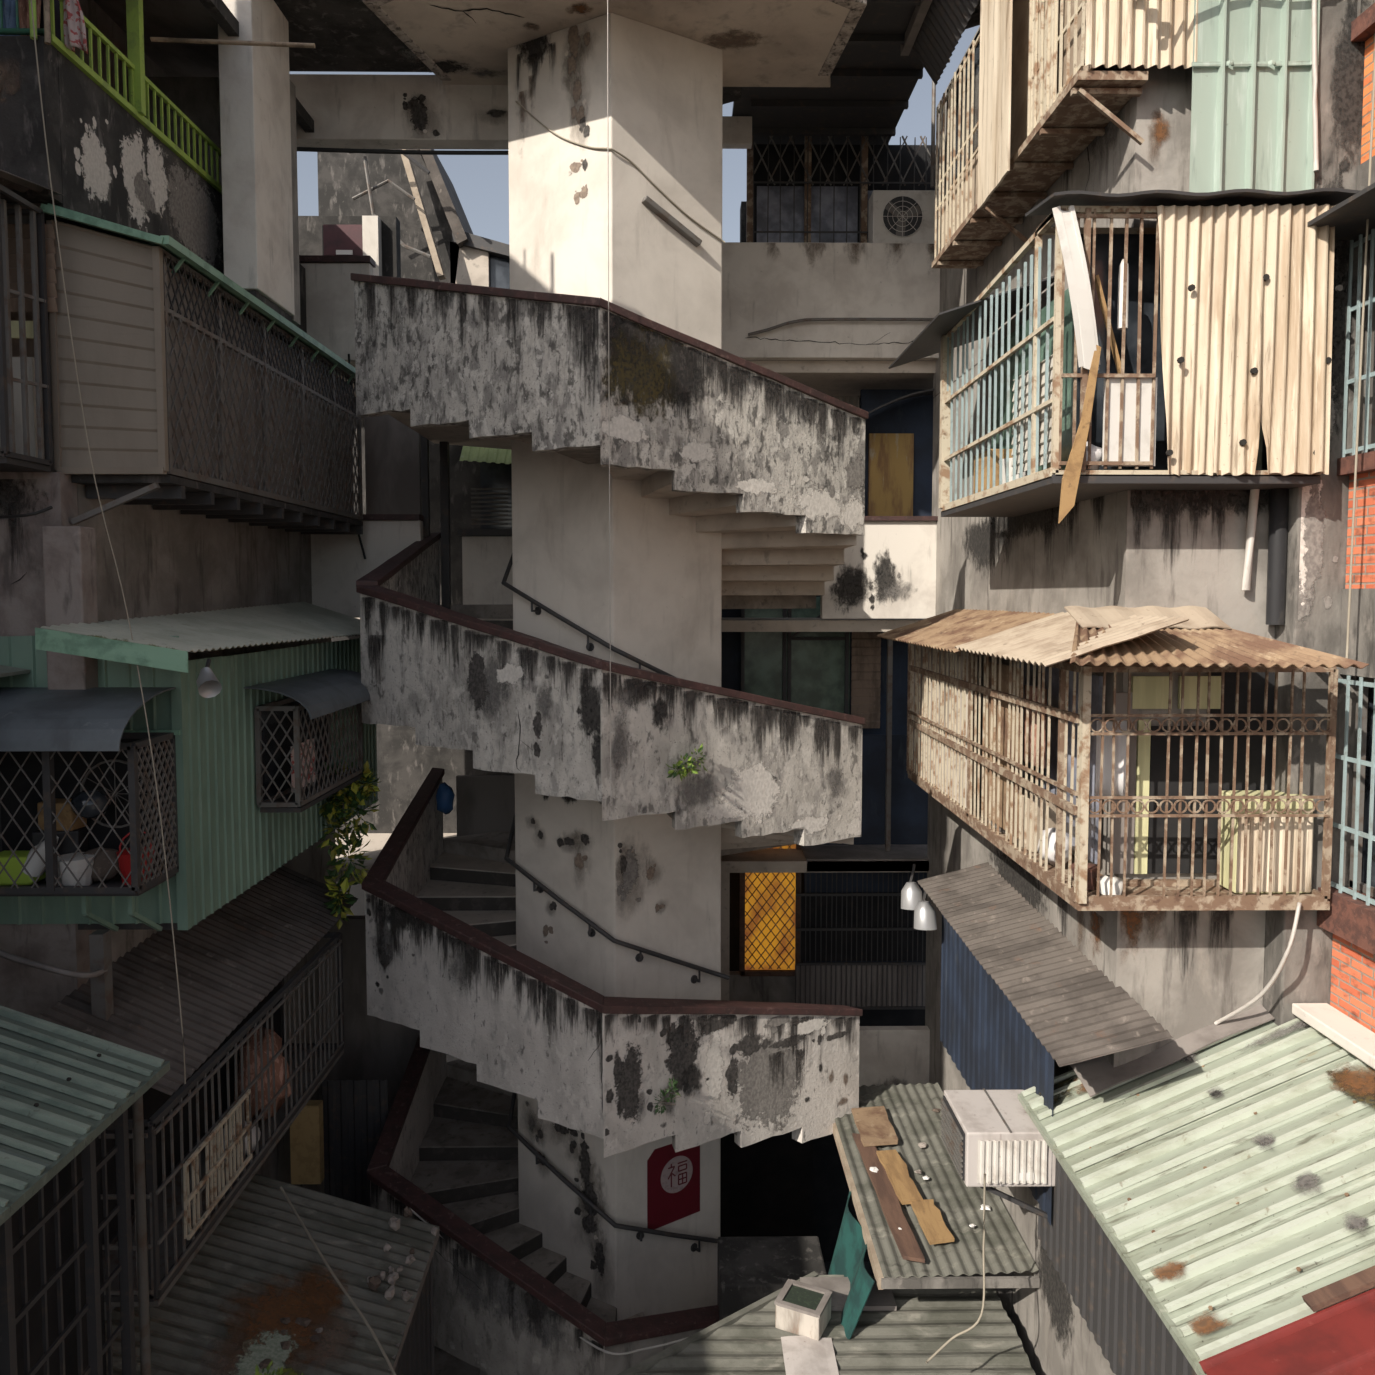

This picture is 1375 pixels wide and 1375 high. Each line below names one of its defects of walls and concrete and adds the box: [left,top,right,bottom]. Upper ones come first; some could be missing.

leakage [516,35,556,121]
peeling [74,116,223,269]
leakage [365,283,862,450]
crack [747,333,912,345]
leakage [830,548,910,611]
leakage [362,597,861,795]
corrosion [991,849,1103,948]
leakage [366,894,855,1070]
corrosion [1040,1077,1086,1102]
corrosion [1326,1067,1375,1109]
corrosion [1152,1262,1184,1280]
corrosion [1190,1315,1229,1335]